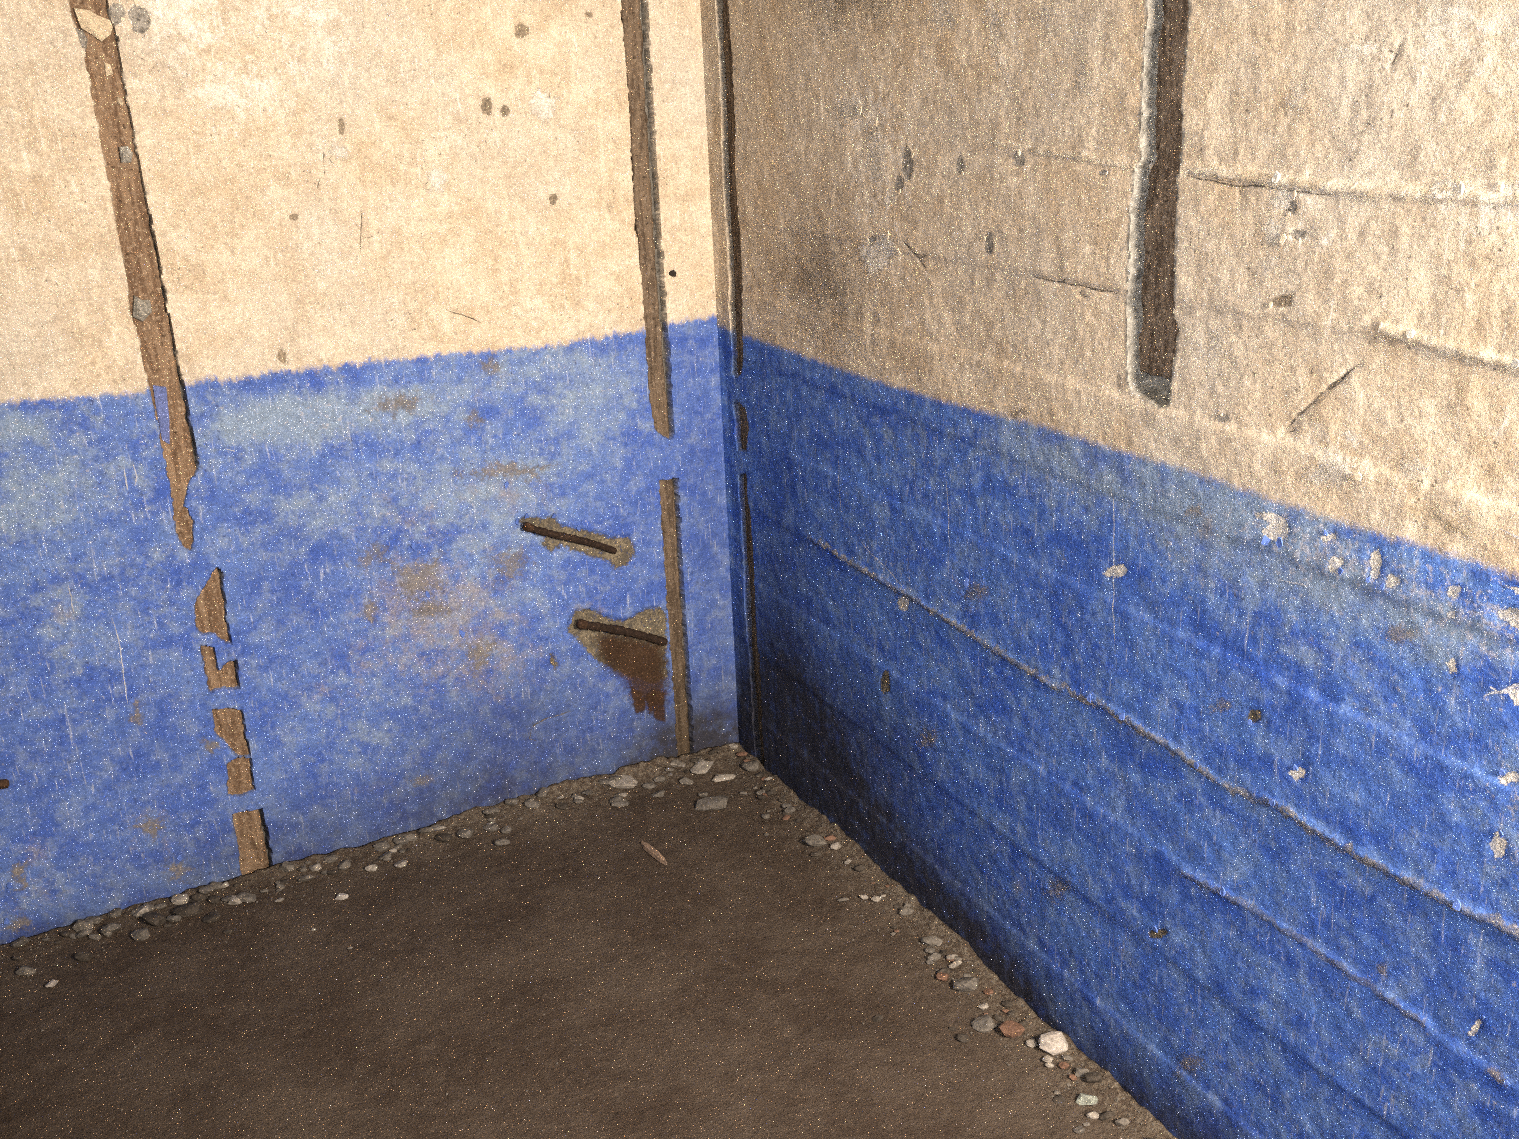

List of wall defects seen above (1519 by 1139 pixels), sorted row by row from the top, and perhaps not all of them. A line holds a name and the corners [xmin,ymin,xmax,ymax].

peeling [1256,511,1288,548]
peeling [1321,530,1344,575]
peeling [1105,564,1128,577]
peeling [1366,549,1400,590]
peeling [1447,585,1465,618]
peeling [1498,582,1519,629]
corrosion [599,633,667,721]
peeling [1509,688,1519,706]
peeling [1248,710,1261,725]
peeling [1290,764,1305,781]
peeling [1499,769,1519,785]
peeling [1490,830,1507,858]